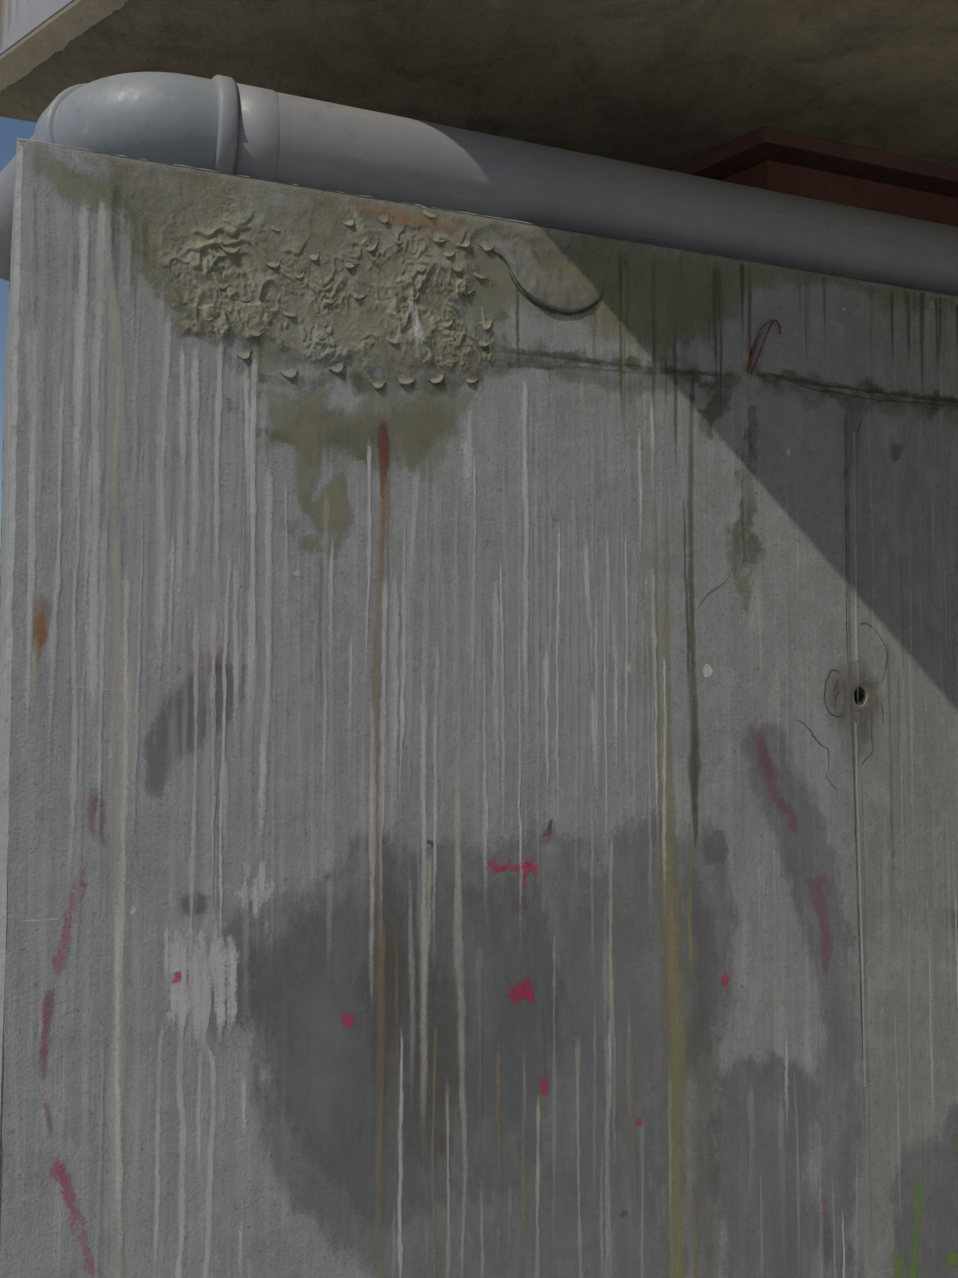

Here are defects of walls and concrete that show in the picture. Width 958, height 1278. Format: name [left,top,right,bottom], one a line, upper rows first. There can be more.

peeling [102,158,592,389]
leakage [586,236,792,441]
crack [761,372,958,413]
corrosion [377,425,389,604]
leakage [463,383,529,865]
leakage [585,407,657,811]
leakage [652,546,700,1278]
leakage [432,1101,450,1257]